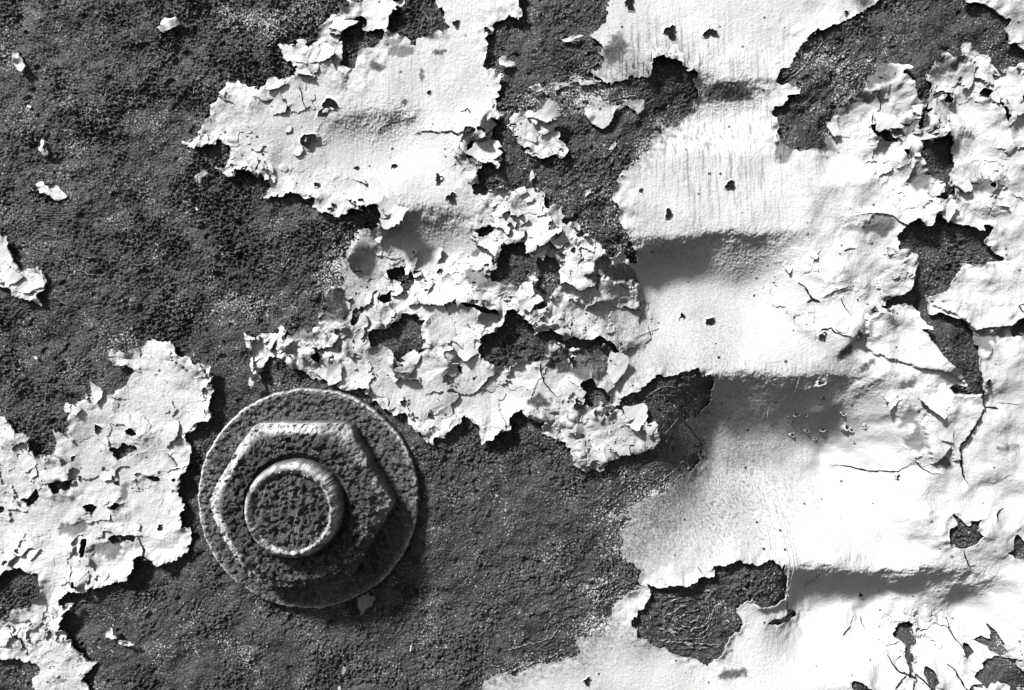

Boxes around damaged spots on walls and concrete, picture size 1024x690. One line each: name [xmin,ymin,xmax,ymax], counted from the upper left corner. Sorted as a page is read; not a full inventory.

peeling [0,0,789,690]
peeling [759,0,1024,481]
crack [830,304,1024,485]